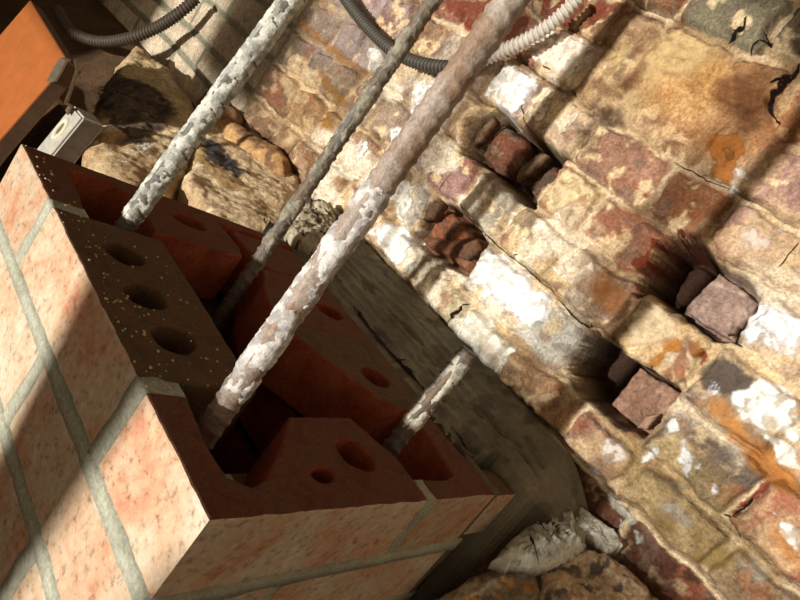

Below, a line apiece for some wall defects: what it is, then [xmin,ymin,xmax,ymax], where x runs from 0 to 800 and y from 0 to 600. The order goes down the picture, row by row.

crack [728,12,797,55]
crack [768,63,800,125]
rust [707,75,766,184]
crack [674,162,730,191]
rust [649,338,682,367]
rust [711,403,797,493]
rust [775,534,793,556]